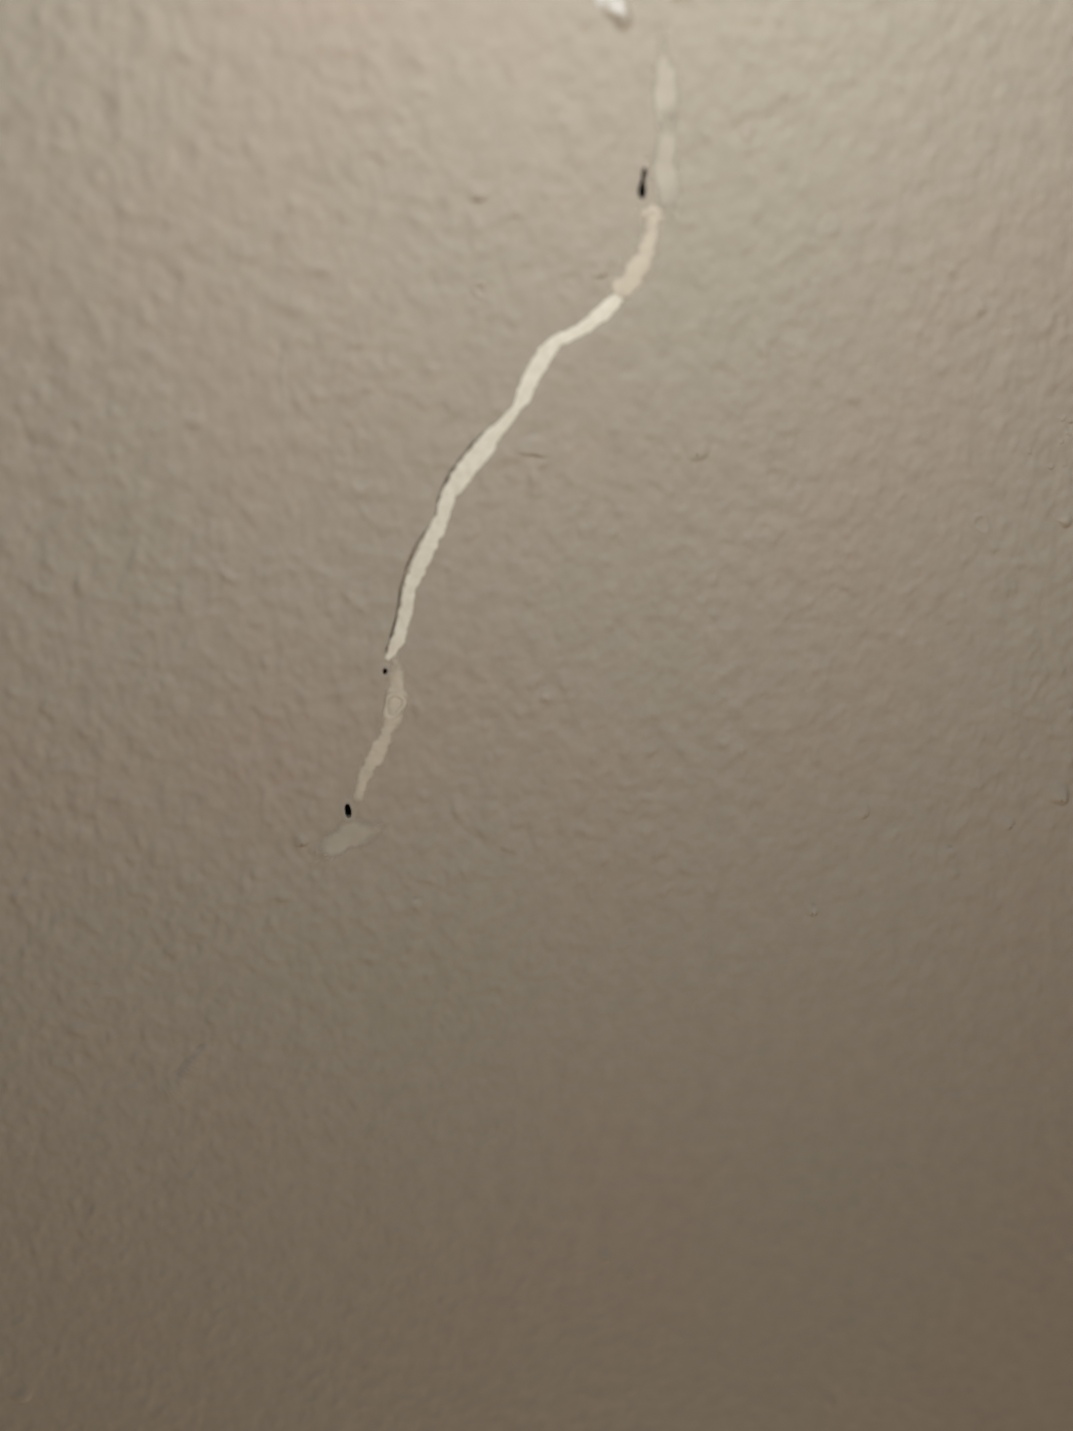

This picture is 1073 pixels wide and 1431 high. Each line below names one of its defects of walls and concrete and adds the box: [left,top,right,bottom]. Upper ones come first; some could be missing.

crack [322,46,679,857]